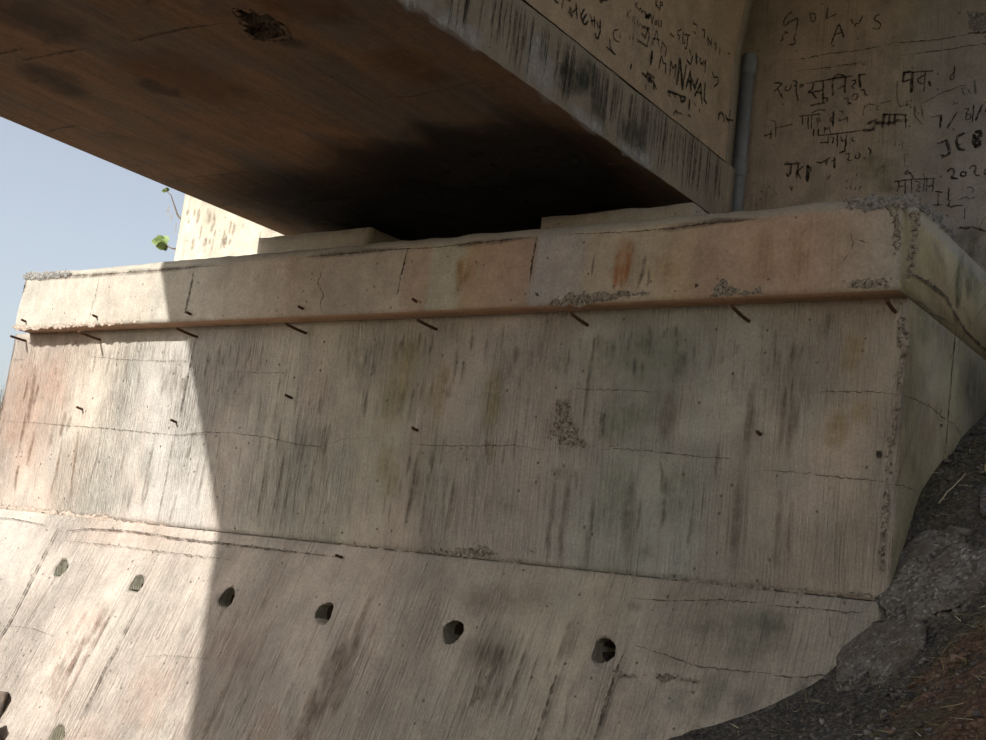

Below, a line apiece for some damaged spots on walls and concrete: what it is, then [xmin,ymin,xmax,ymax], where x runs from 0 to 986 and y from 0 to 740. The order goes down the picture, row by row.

spalling [232,8,292,43]
damp [442,0,722,202]
spalling [549,290,650,327]
spalling [709,279,761,323]
spalling [843,193,954,575]
crack [822,274,986,454]
crack [594,645,825,740]